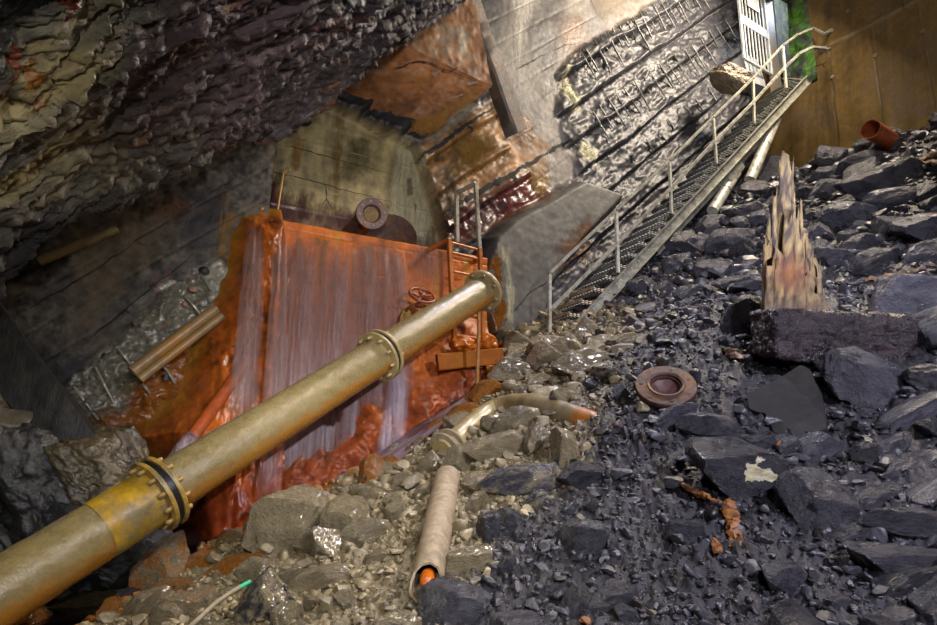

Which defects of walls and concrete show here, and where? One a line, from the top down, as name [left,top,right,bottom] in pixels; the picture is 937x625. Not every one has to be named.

crack [392,61,485,84]
crack [286,108,493,175]
crack [273,172,393,206]
rust [487,252,508,336]
rust [97,341,197,428]